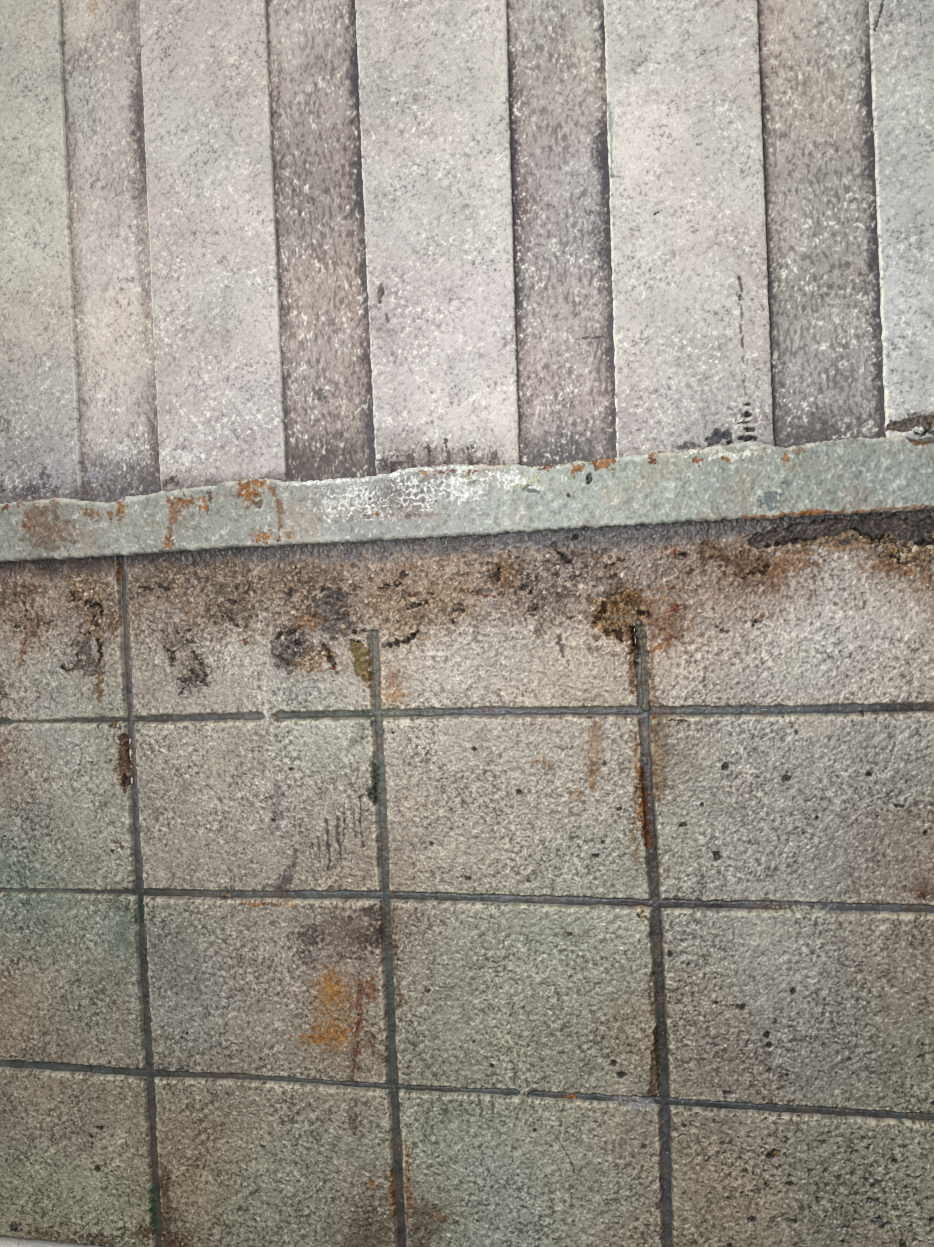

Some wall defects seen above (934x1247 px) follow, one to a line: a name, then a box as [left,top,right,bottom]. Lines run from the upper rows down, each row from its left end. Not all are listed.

spalling [885,410,934,445]
rust [2,499,128,556]
rust [162,491,212,551]
rust [238,479,291,544]
rust [616,568,704,849]
rust [301,959,377,1069]